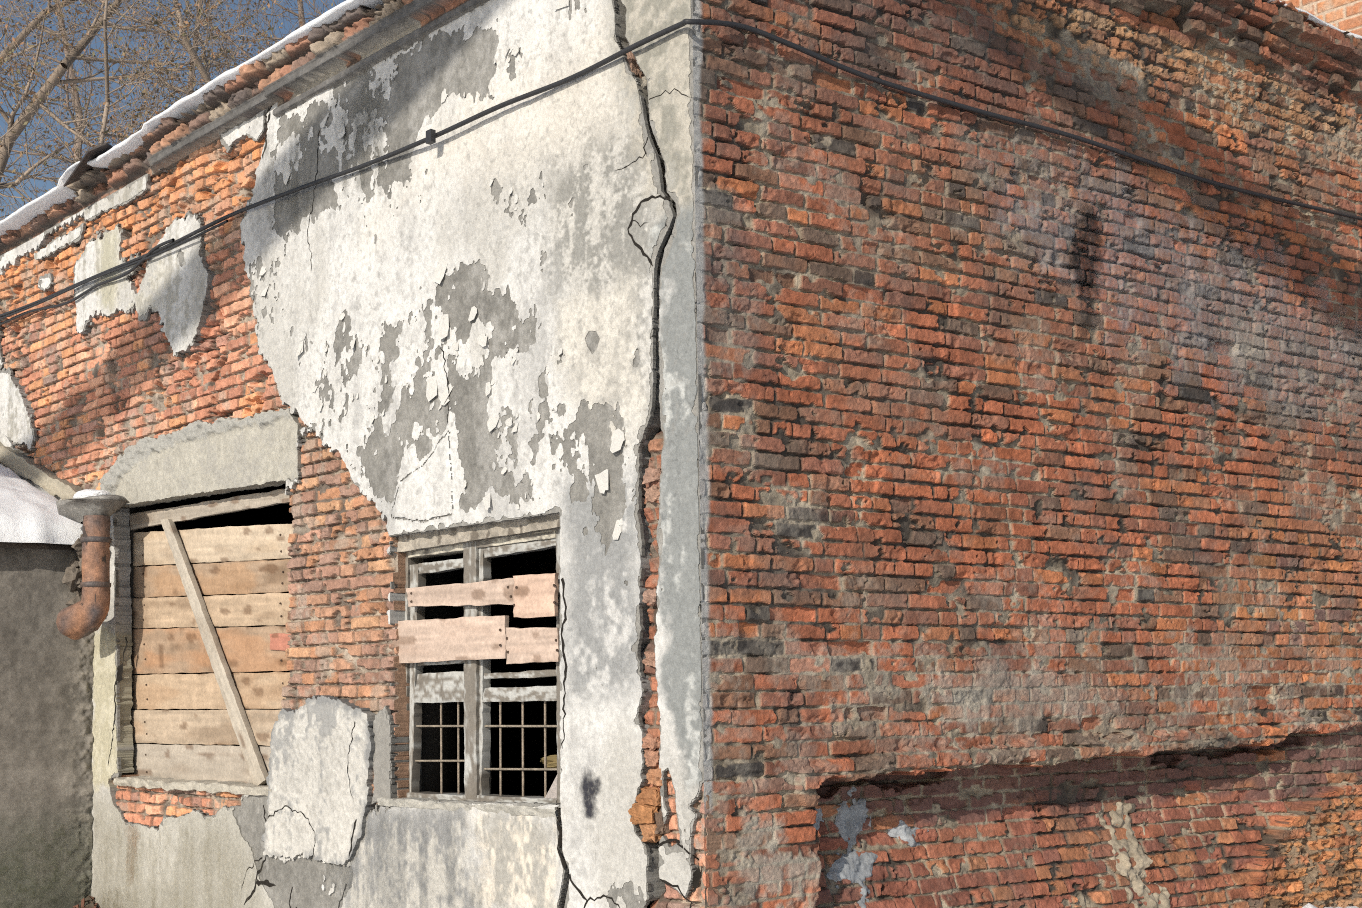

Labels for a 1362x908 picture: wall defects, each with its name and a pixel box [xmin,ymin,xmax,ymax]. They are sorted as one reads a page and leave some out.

crack [626,45,688,100]
crack [627,195,670,266]
spalling [0,0,726,908]
crack [556,431,701,908]
crack [241,805,315,908]
crack [338,721,357,908]
spalling [815,725,1362,908]